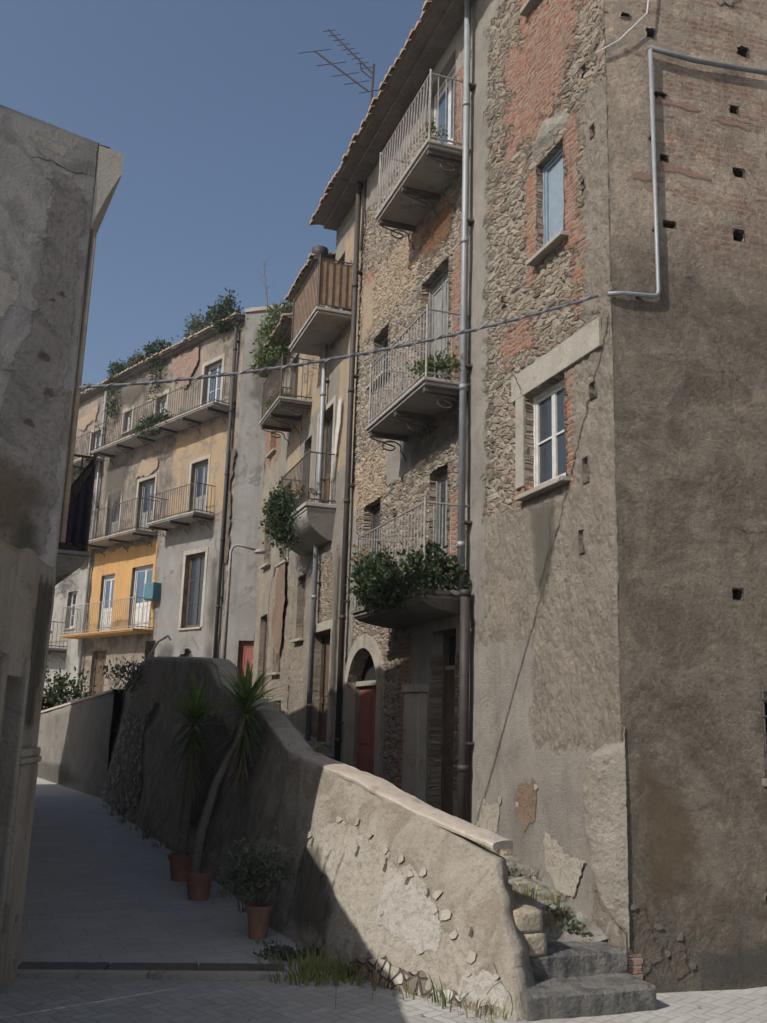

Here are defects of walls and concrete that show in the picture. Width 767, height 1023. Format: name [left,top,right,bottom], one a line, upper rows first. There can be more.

spalling [736,44,751,58]
spalling [733,228,745,242]